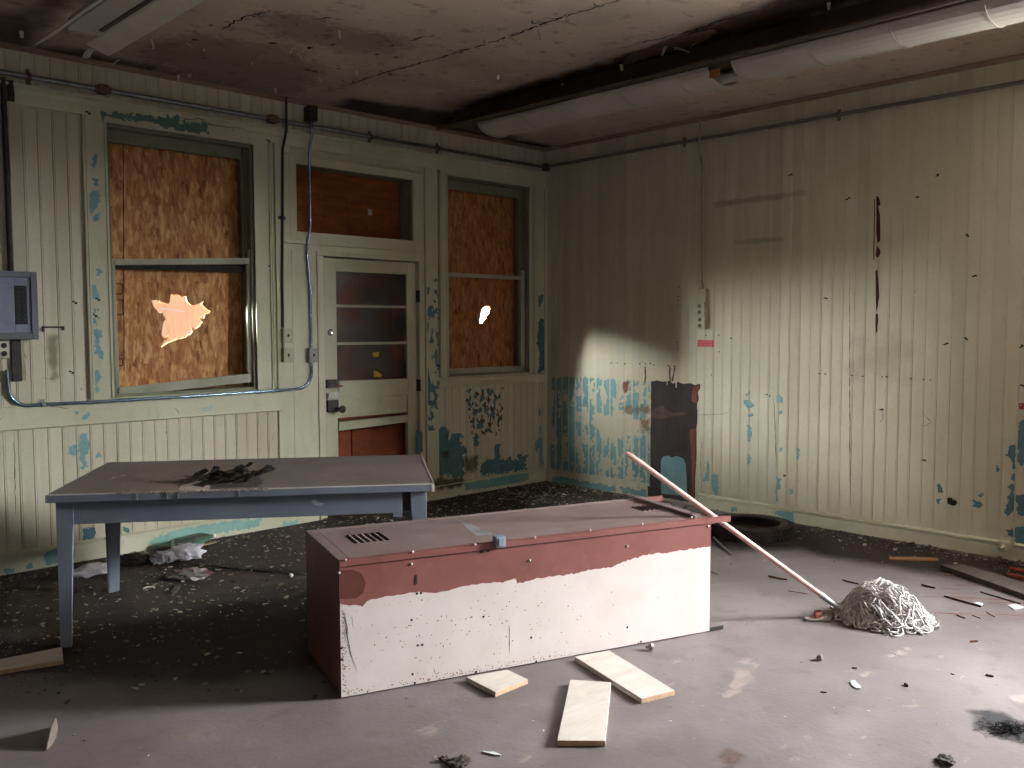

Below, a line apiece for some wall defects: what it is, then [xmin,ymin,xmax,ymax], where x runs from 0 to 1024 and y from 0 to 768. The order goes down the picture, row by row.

crack [322,0,619,92]
peeling [85,111,209,136]
peeling [89,154,101,223]
peeling [86,269,104,393]
peeling [416,278,650,497]
peeling [68,433,102,469]
peeling [149,518,262,547]
peeling [993,420,1024,561]